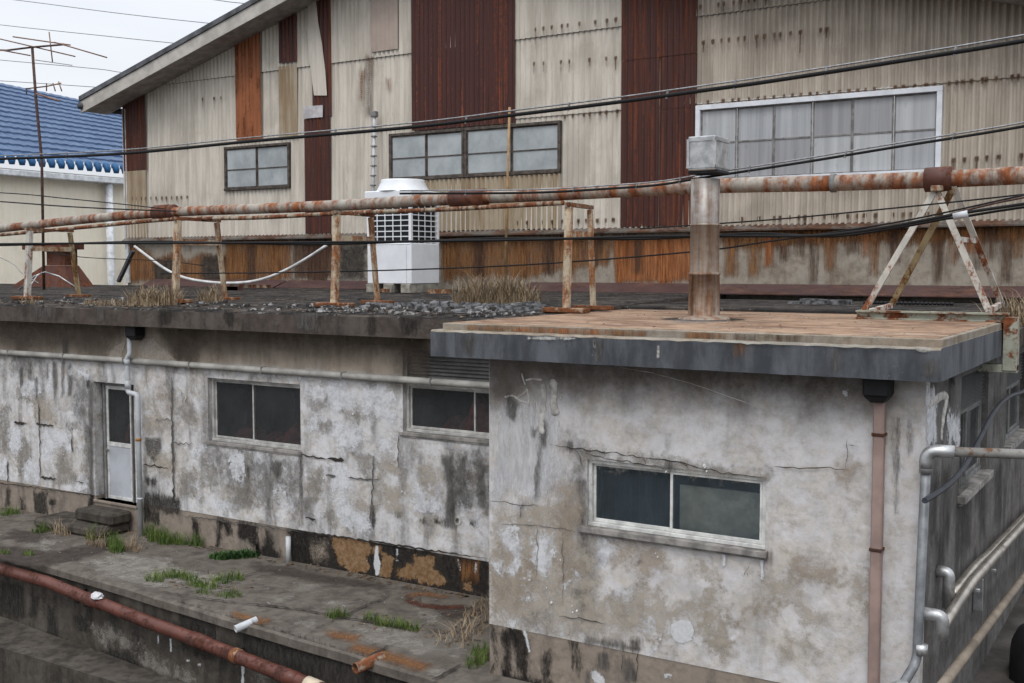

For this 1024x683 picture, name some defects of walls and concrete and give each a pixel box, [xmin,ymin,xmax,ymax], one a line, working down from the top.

corrosion [723,212,1024,281]
damp [5,487,48,515]
damp [0,530,109,566]
damp [143,438,180,525]
crack [154,380,487,559]
damp [212,453,489,618]
peeling [304,378,446,587]
damp [442,395,593,623]
crack [494,501,603,624]
crack [550,442,858,482]
damp [490,624,551,683]
damp [571,637,640,681]